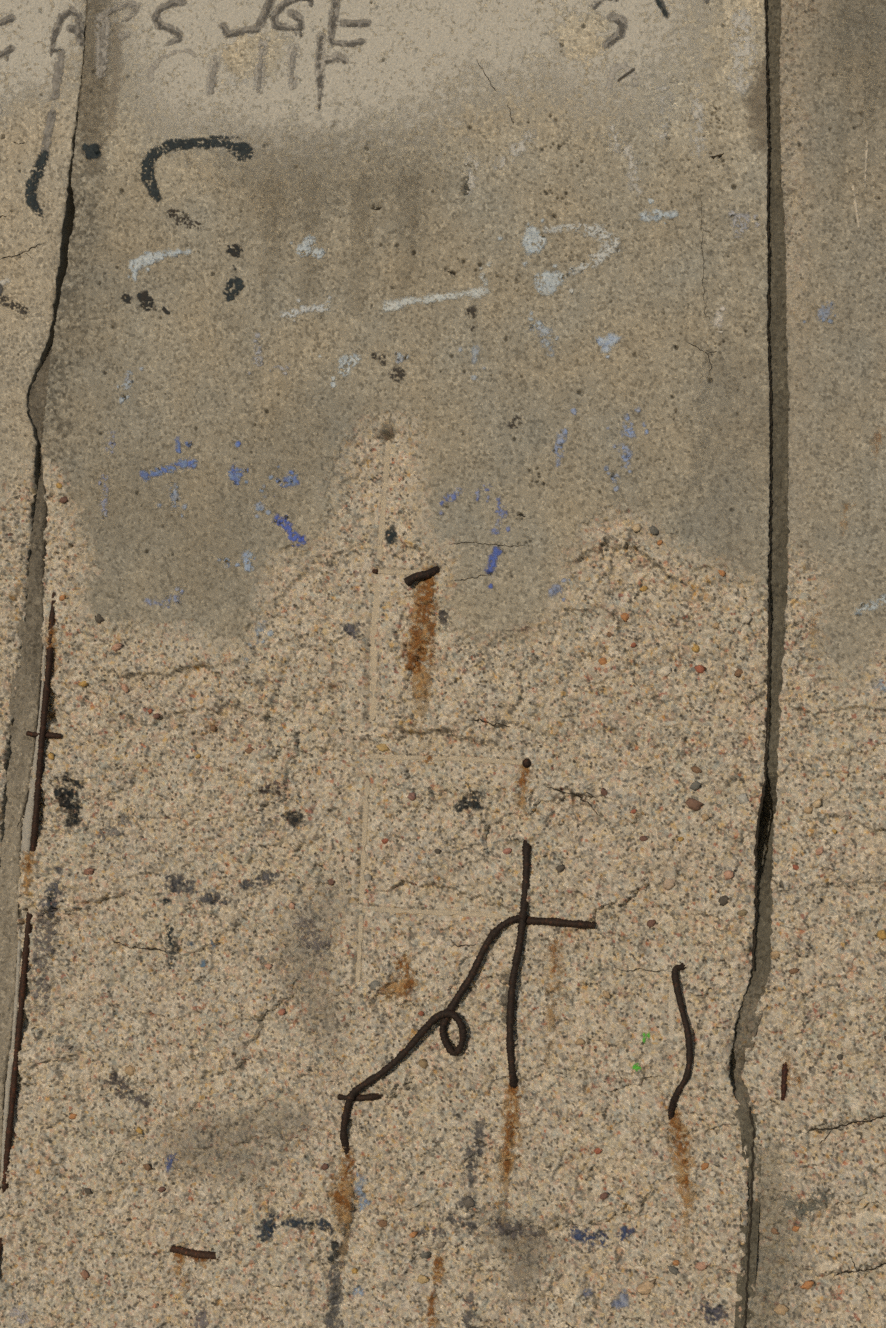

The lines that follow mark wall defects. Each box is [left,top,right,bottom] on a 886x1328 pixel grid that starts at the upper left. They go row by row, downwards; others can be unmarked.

crack [41,503,49,574]
crack [751,0,772,971]
corrosion [403,568,439,737]
crack [17,645,44,841]
corrosion [22,850,36,894]
spalling [0,409,886,1328]
corrosion [380,959,417,998]
corrosion [329,1150,354,1253]
corrosion [495,1085,522,1216]
corrosion [669,1110,695,1253]
crack [743,1107,755,1328]